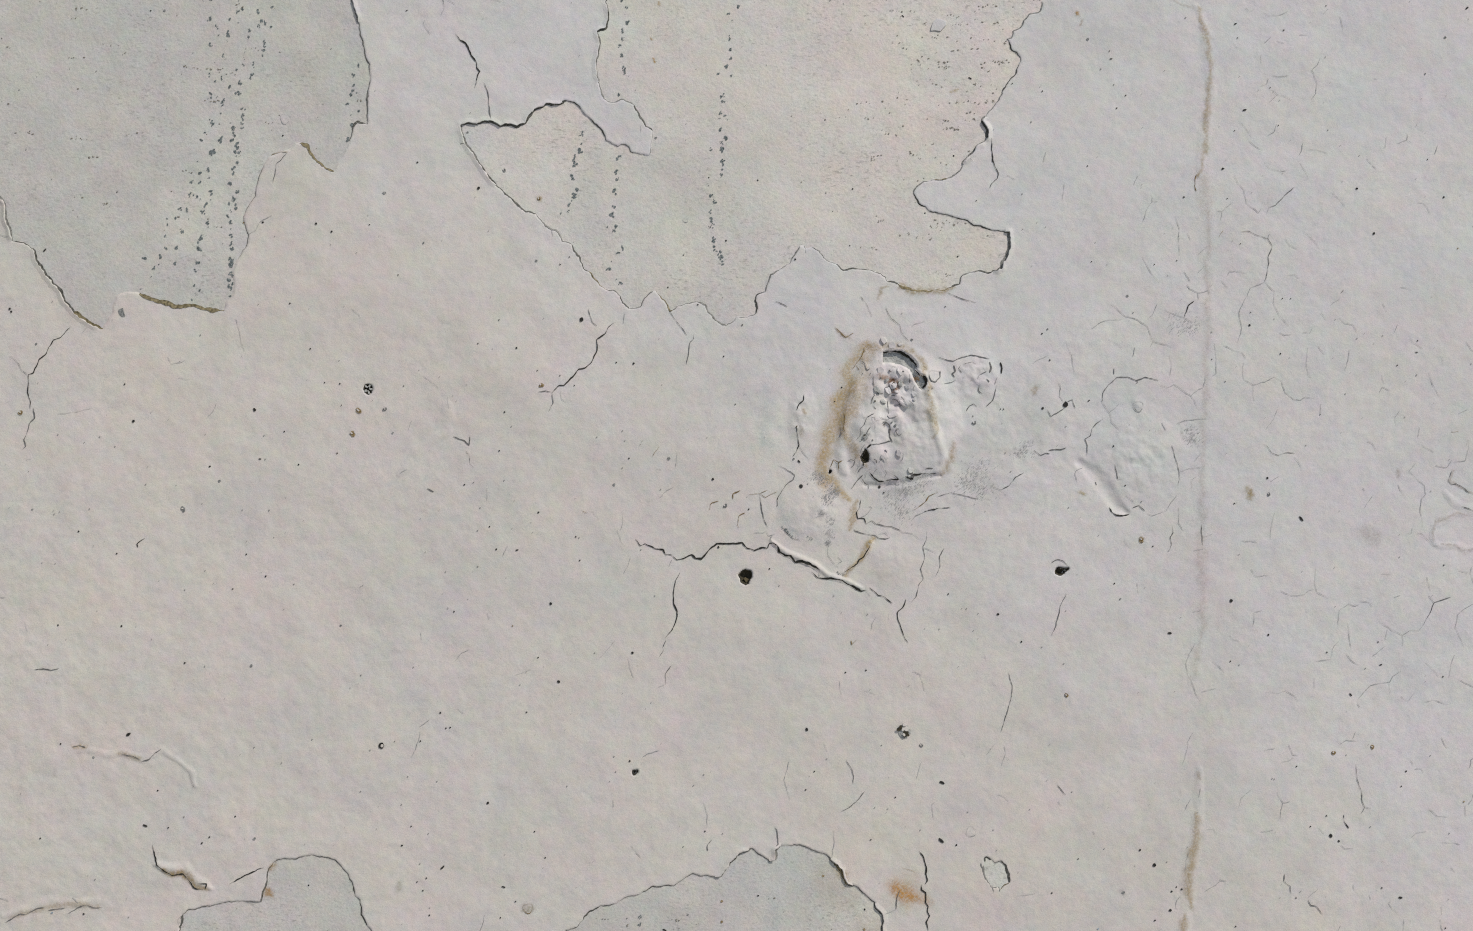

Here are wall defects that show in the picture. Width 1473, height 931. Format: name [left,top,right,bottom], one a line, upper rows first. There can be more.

peeling [0,0,371,331]
peeling [456,0,1043,326]
crack [10,328,85,460]
corrosion [819,342,880,500]
crack [1186,287,1473,849]
peeling [174,855,372,931]
peeling [552,842,889,931]